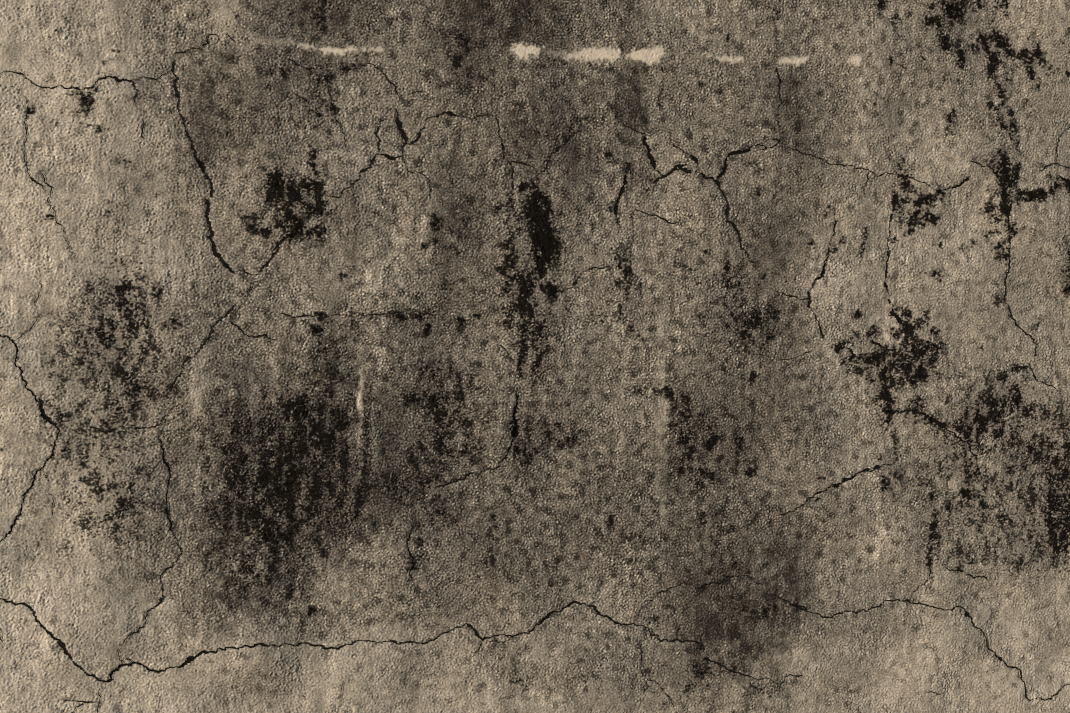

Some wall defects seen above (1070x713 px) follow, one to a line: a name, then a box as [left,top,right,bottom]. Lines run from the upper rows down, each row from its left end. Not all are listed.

water stain [41,256,200,555]
water stain [238,144,333,251]
water stain [192,307,496,610]
crack [0,1,802,713]
water stain [421,211,443,249]
water stain [454,178,571,387]
crack [551,10,1070,495]
crack [780,463,893,516]
crack [643,547,1070,701]
water stain [831,302,1070,578]